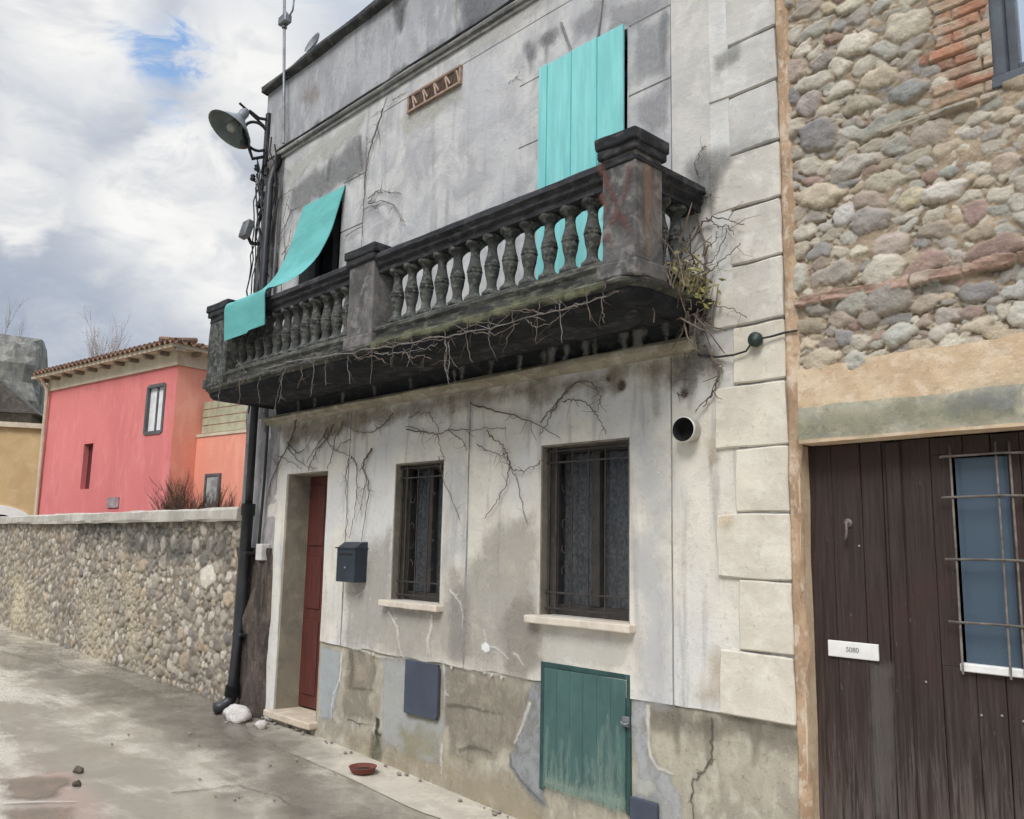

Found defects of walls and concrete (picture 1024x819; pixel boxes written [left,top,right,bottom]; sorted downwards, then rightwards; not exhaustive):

leakage [349,522,539,674]
crack [646,705,714,819]